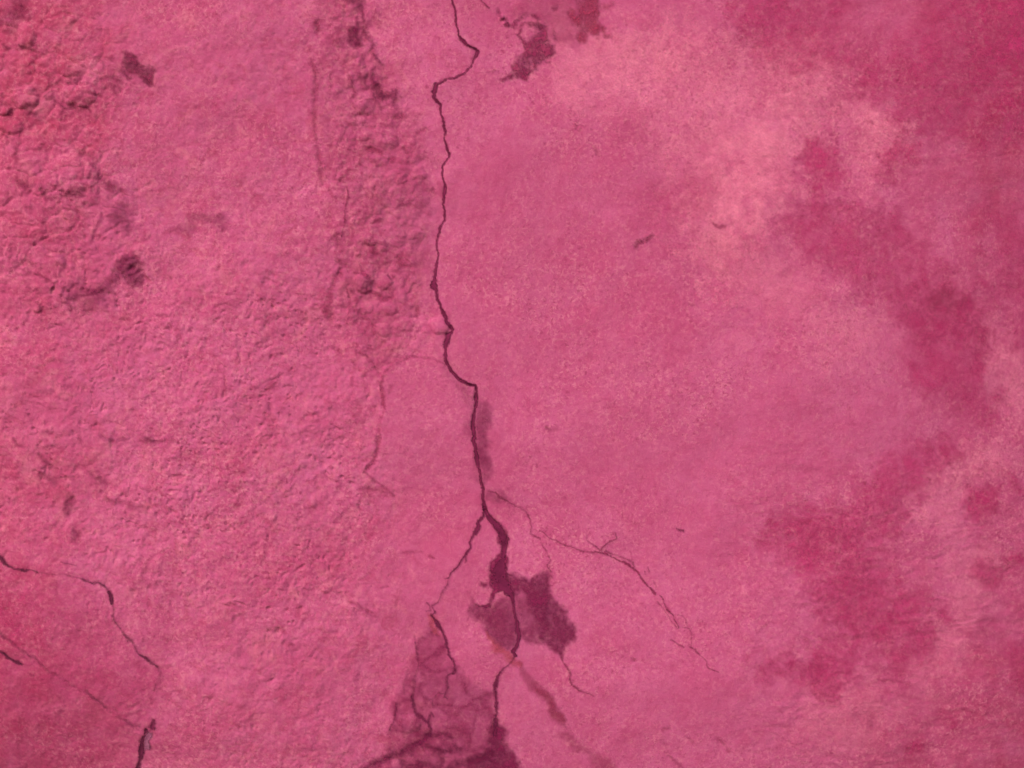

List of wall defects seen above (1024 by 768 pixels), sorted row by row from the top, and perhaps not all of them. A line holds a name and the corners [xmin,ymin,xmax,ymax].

crack [430,0,715,737]
crack [0,651,22,665]
crack [0,556,37,572]
crack [94,582,158,667]
crack [136,720,155,768]
crack [389,604,456,736]
water stain [368,645,520,768]
water stain [476,515,575,657]